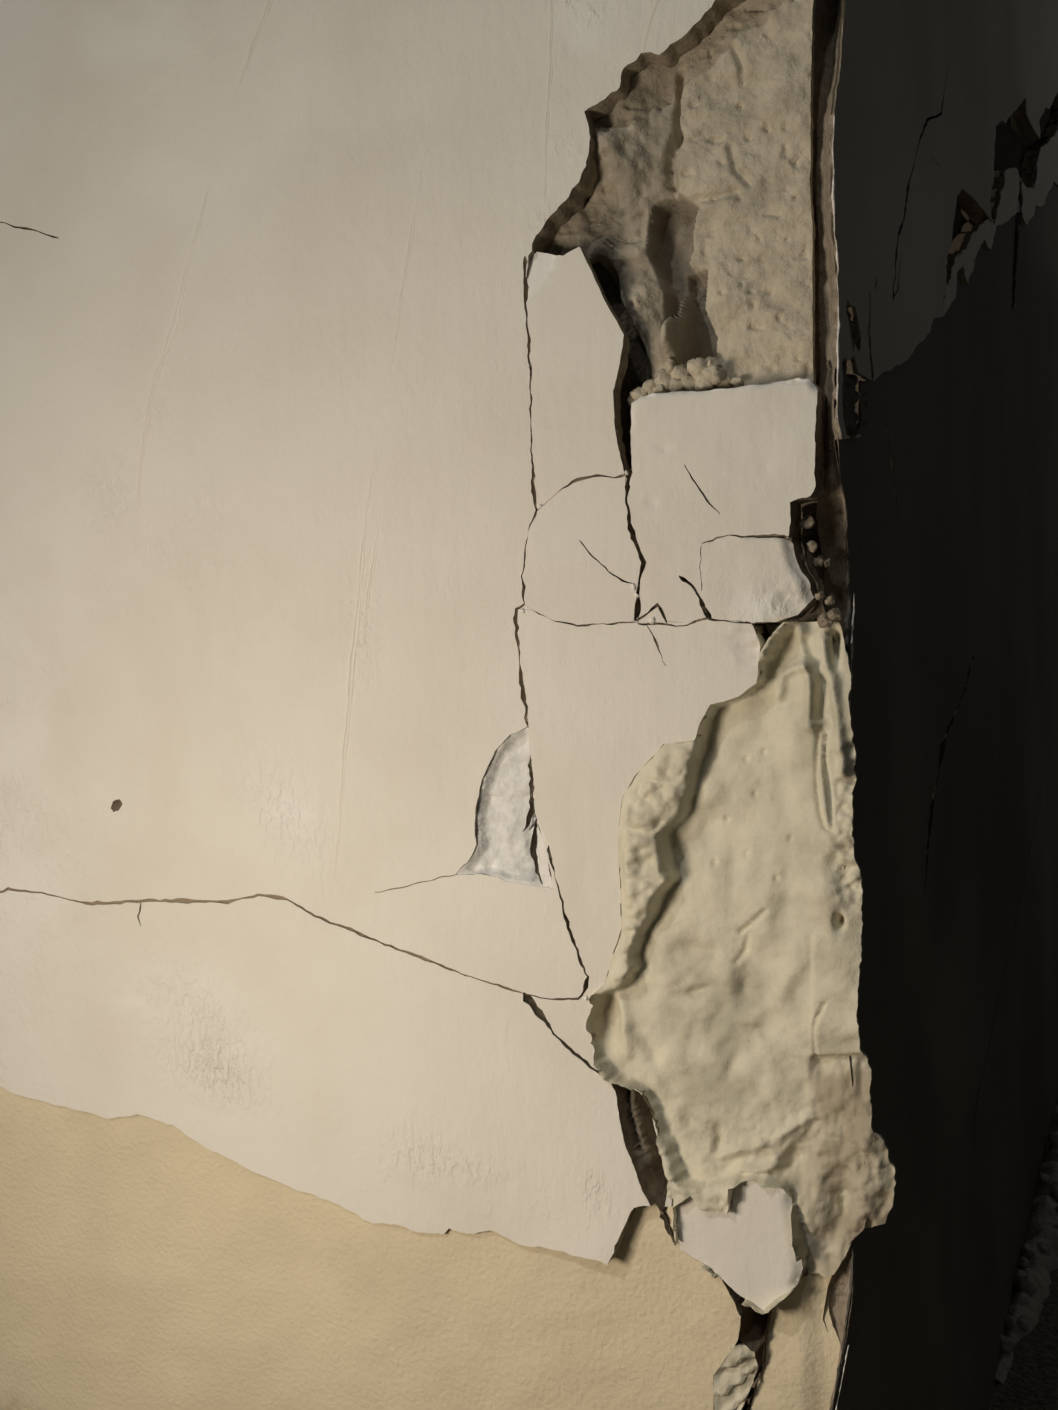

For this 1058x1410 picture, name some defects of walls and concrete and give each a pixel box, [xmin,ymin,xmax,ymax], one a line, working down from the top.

crack [0,222,59,239]
crack [861,103,943,382]
crack [0,256,789,1245]
flaking render [456,727,553,889]
peeling [522,0,1058,1410]
flaking render [0,1087,742,1410]
crack [713,1279,771,1410]